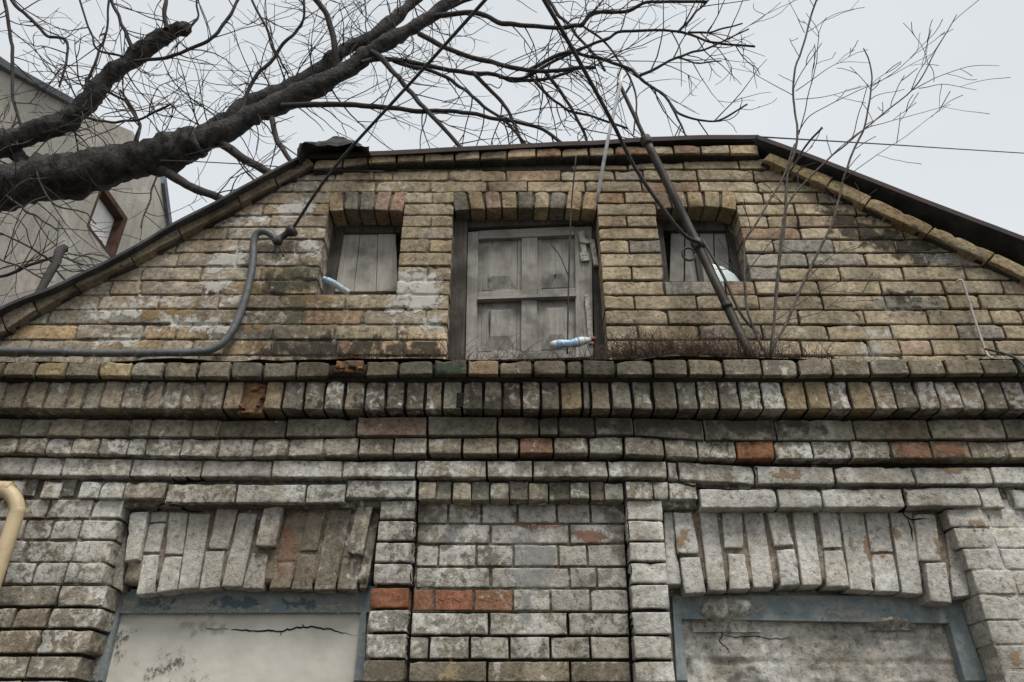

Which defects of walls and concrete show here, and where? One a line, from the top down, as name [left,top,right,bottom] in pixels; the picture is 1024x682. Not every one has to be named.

spalling [237,383,267,420]
crack [898,490,926,539]
crack [206,624,356,636]
crack [719,632,796,657]